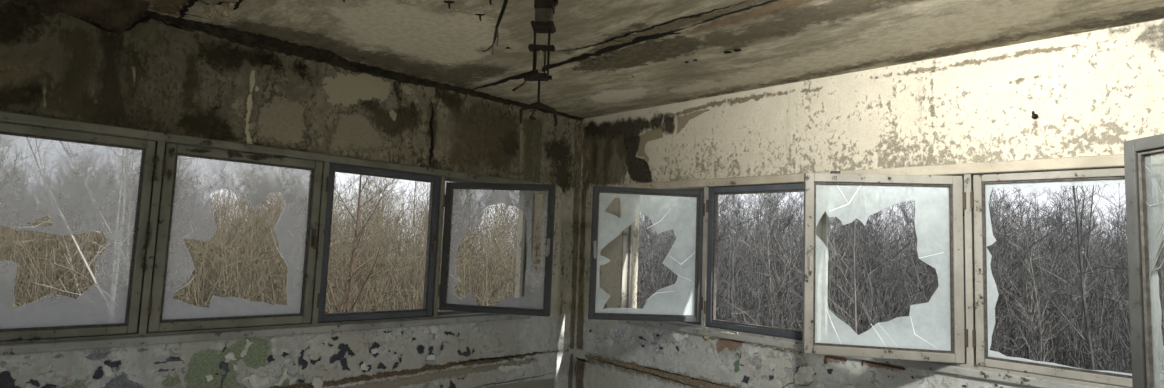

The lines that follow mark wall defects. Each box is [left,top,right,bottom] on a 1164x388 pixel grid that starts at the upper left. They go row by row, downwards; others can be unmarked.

damp [0,1,144,125]
crack [70,0,243,35]
damp [176,42,310,144]
damp [230,21,524,174]
crack [427,100,435,168]
crack [471,0,778,90]
damp [585,114,675,187]
damp [760,7,1164,85]
peeling [0,349,145,388]
peeling [154,331,475,388]
spalling [702,327,801,383]
spalling [861,360,914,388]